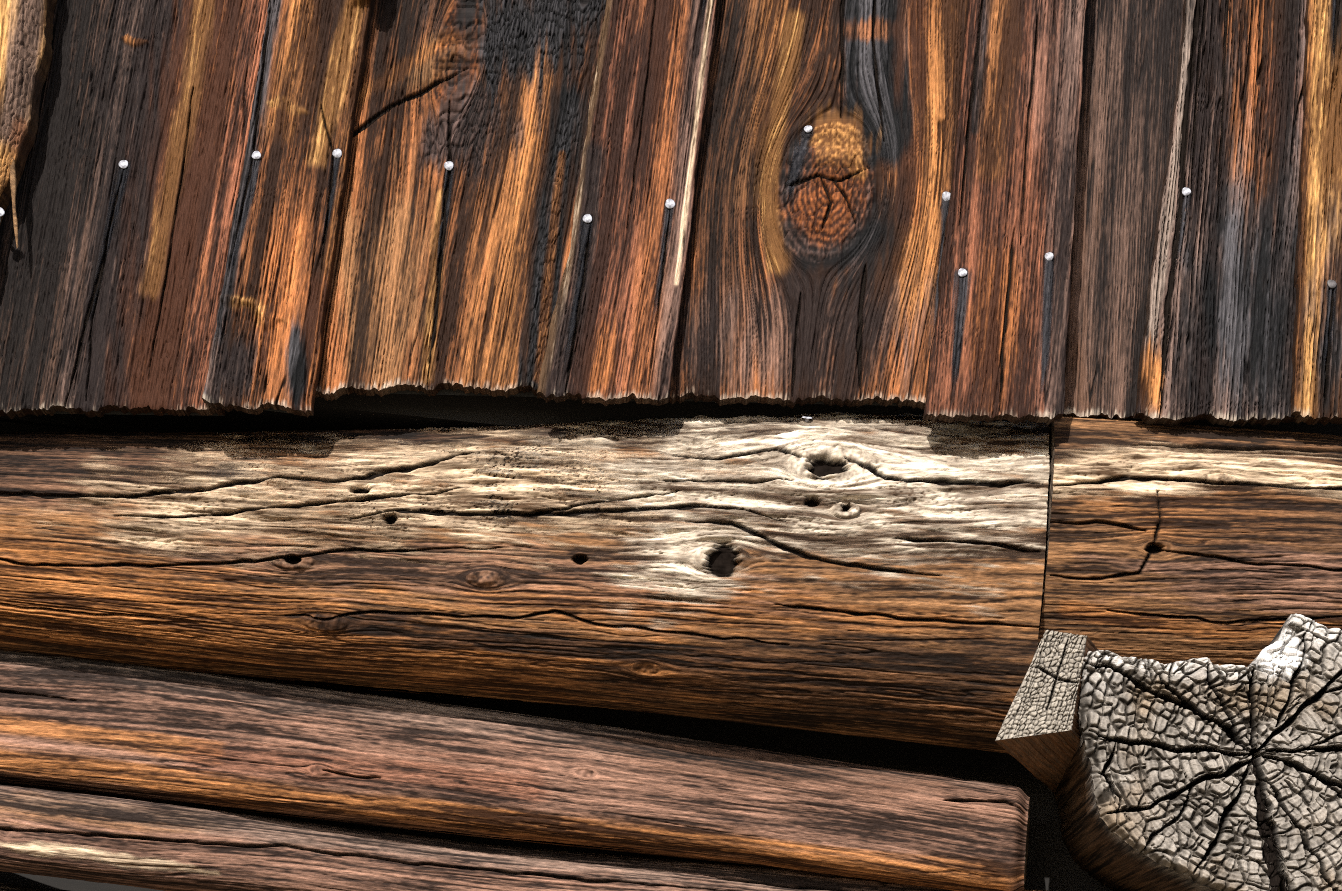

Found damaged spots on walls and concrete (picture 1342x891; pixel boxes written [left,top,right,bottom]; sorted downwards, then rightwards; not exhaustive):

crack [321,69,468,391]